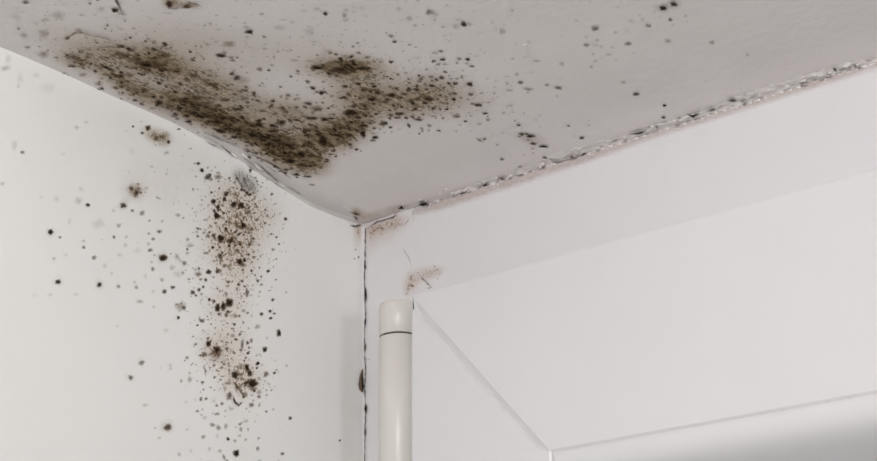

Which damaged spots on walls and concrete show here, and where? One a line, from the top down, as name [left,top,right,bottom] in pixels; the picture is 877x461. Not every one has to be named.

leakage [26,25,495,429]
flaking render [405,53,877,209]